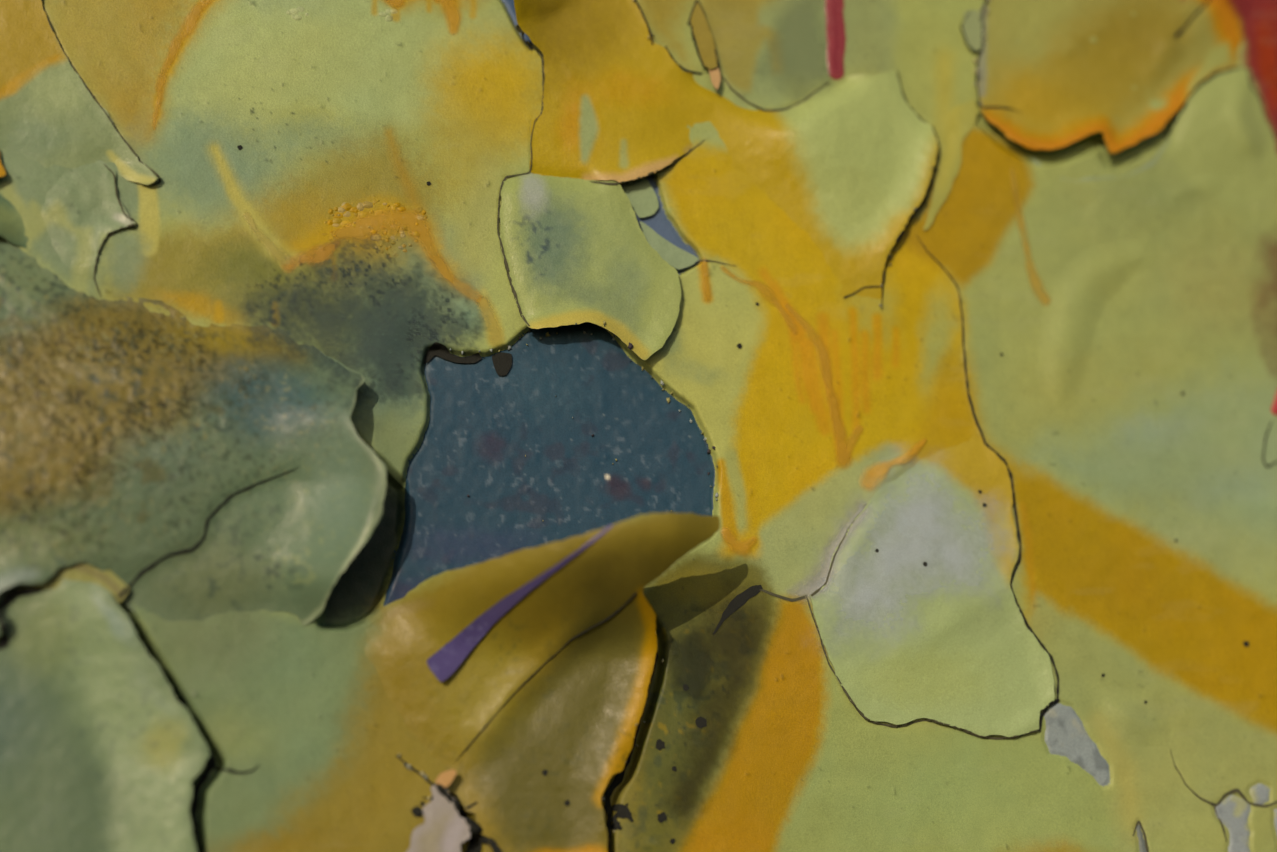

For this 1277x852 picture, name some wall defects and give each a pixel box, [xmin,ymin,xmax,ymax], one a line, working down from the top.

crack [590,140,704,186]
crack [633,0,830,111]
crack [960,0,1020,112]
peeling [0,160,387,852]
crack [117,467,299,599]
peeling [360,0,1277,852]
crack [713,70,1060,740]
crack [136,633,259,852]